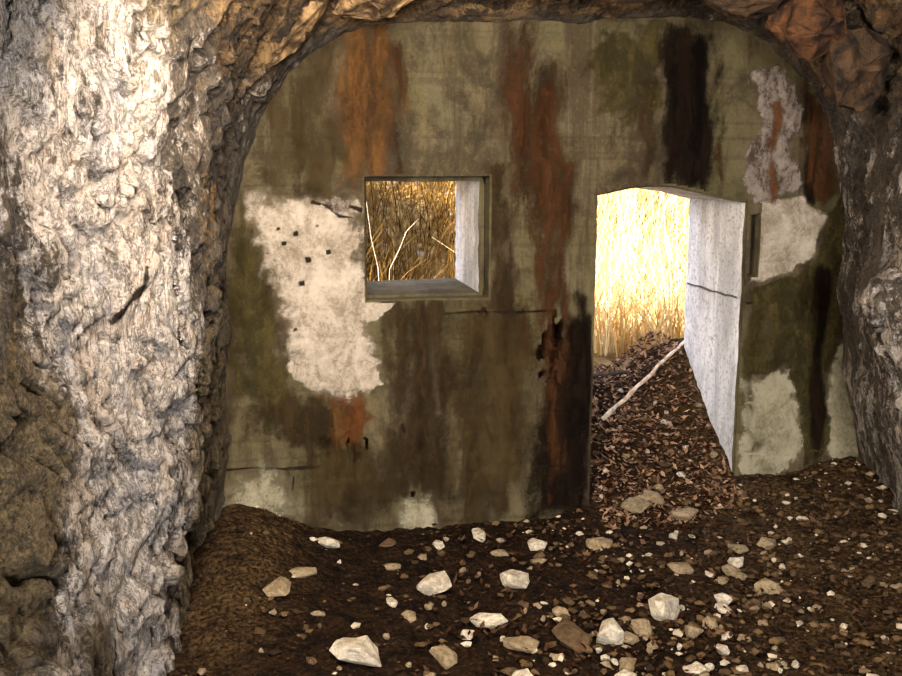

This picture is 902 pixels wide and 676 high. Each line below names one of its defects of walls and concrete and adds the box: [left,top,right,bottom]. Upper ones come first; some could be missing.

peeling [244,192,395,402]
corrosion [504,32,592,520]
damp [589,19,723,192]
peeling [743,61,828,281]
corrosion [331,393,370,455]
peeling [738,369,804,475]